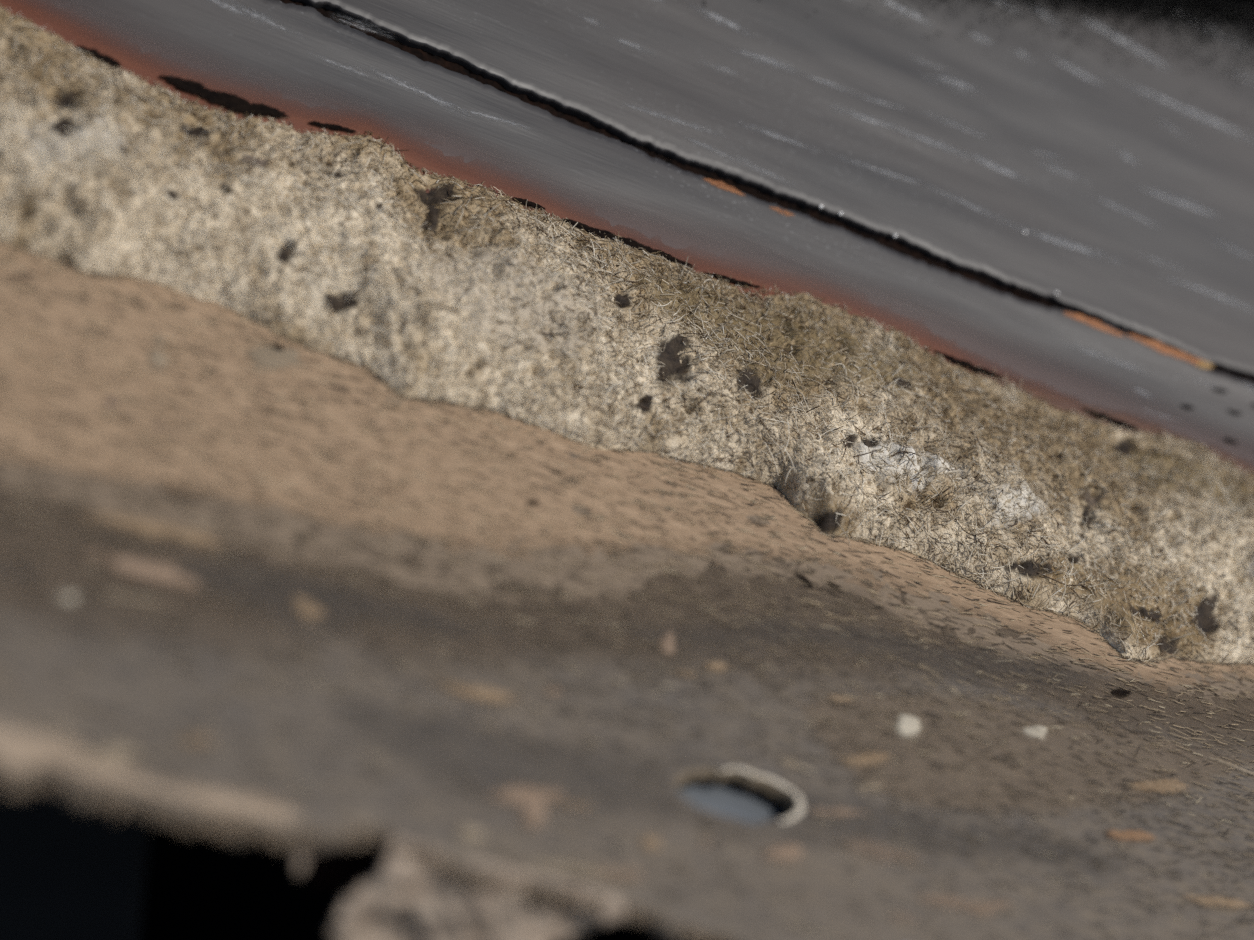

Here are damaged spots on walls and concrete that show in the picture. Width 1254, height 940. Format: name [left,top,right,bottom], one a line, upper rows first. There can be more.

crack [76,46,122,67]
spalling [48,92,76,139]
crack [159,75,356,133]
spalling [181,124,211,139]
spalling [242,155,268,167]
crack [280,0,1127,333]
spalling [414,184,459,233]
crack [935,350,1003,378]
crack [1209,367,1254,384]
crack [1084,408,1141,431]
peeling [0,241,1254,735]
peeling [1133,779,1186,792]